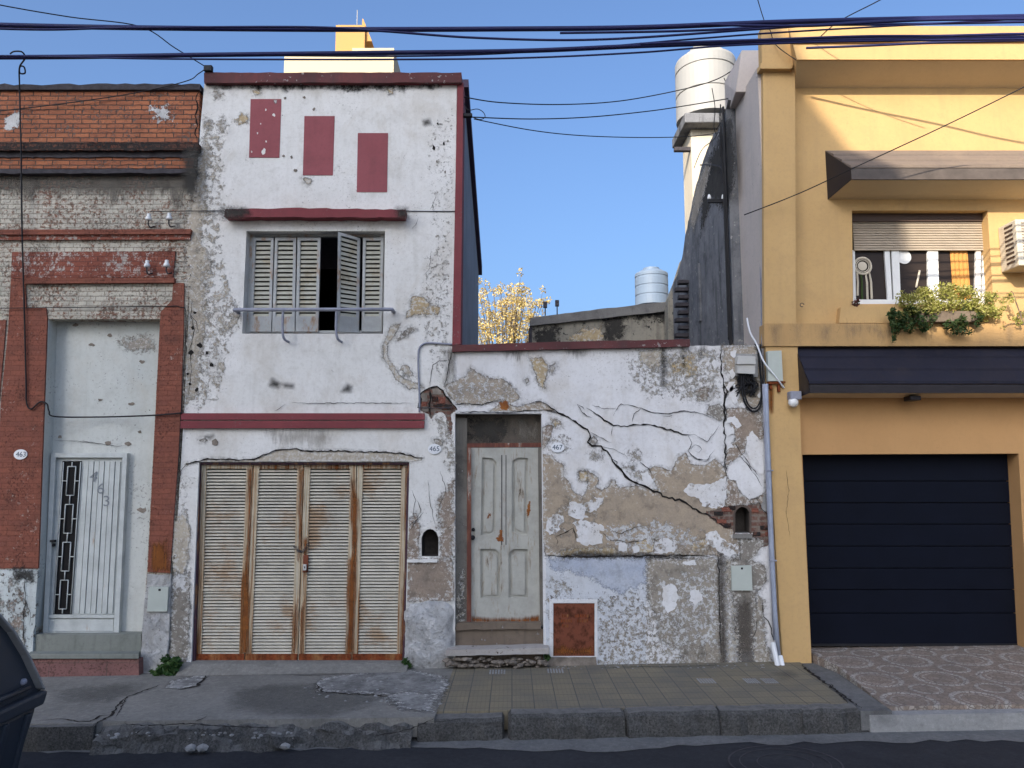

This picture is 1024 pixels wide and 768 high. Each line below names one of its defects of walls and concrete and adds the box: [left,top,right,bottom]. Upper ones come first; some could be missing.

peeling [182,113,267,413]
peeling [382,100,772,665]
crack [430,350,790,534]
peeling [0,566,38,647]
peeling [168,448,422,662]
corrosion [240,465,407,654]
corrosion [553,645,593,655]